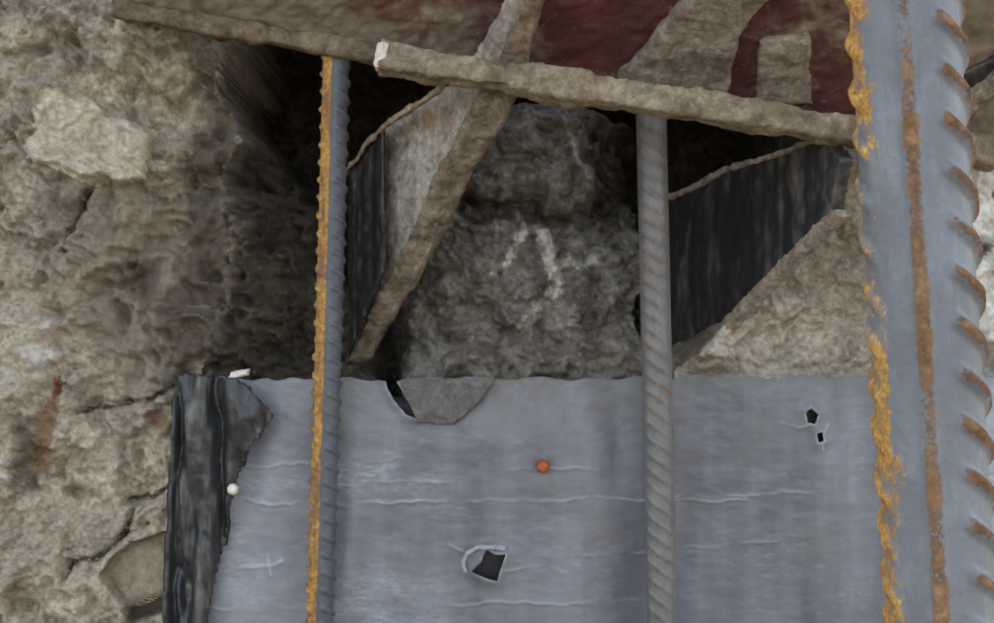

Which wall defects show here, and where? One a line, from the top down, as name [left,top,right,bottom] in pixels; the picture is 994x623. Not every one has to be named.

rust [31,376,62,469]
spalling [202,40,805,623]
spalling [844,0,994,623]